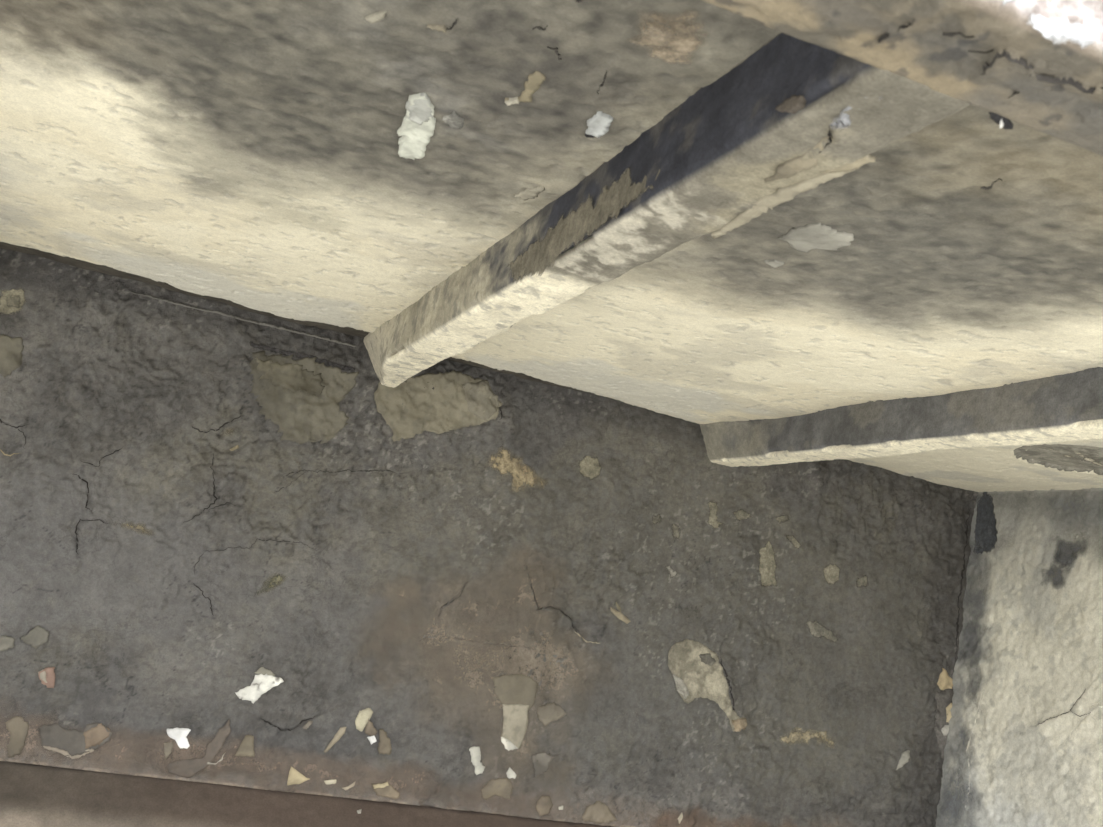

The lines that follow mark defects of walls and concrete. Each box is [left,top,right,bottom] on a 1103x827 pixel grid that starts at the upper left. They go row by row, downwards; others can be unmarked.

peeling [1031,15,1095,47]
peeling [397,93,464,160]
peeling [249,350,360,445]
peeling [374,370,502,442]
crack [74,447,123,554]
crack [183,412,243,523]
leakage [970,492,998,554]
leakage [1045,541,1086,587]
peeling [235,667,284,704]
spalling [668,639,747,732]
leakage [942,766,973,827]